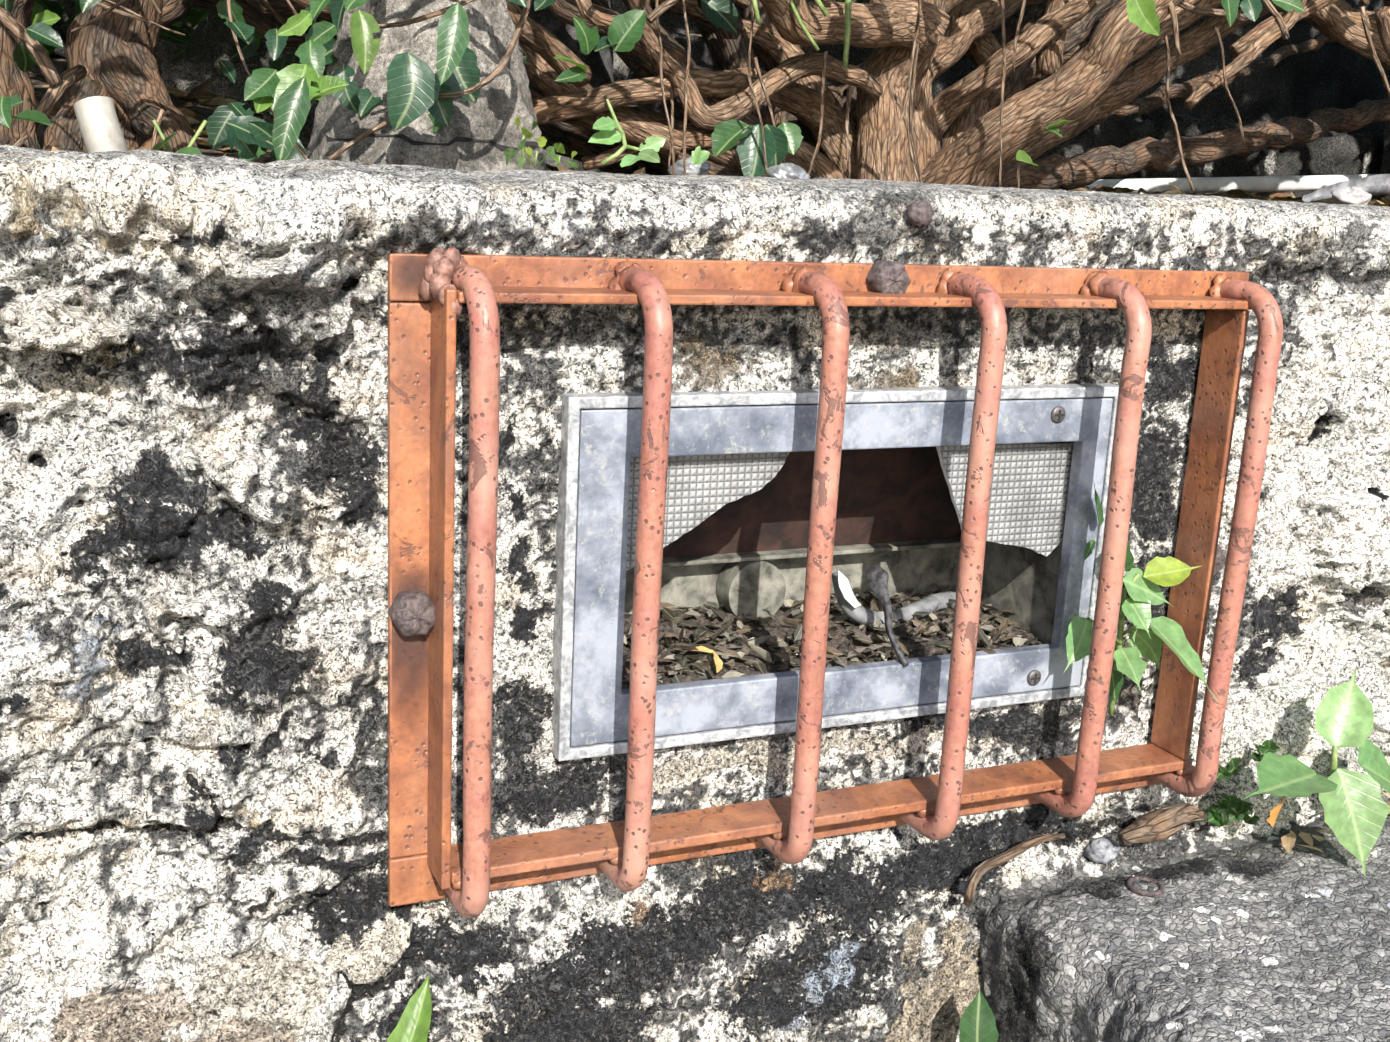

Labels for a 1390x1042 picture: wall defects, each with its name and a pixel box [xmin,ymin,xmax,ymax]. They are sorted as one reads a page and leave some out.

damp [9,173,155,256]
damp [169,219,265,252]
damp [0,304,270,402]
damp [277,349,386,530]
damp [47,445,292,596]
damp [0,693,27,716]
damp [49,578,383,786]
damp [492,679,622,829]
damp [861,713,945,748]
damp [969,703,1082,754]
damp [80,779,1128,1042]